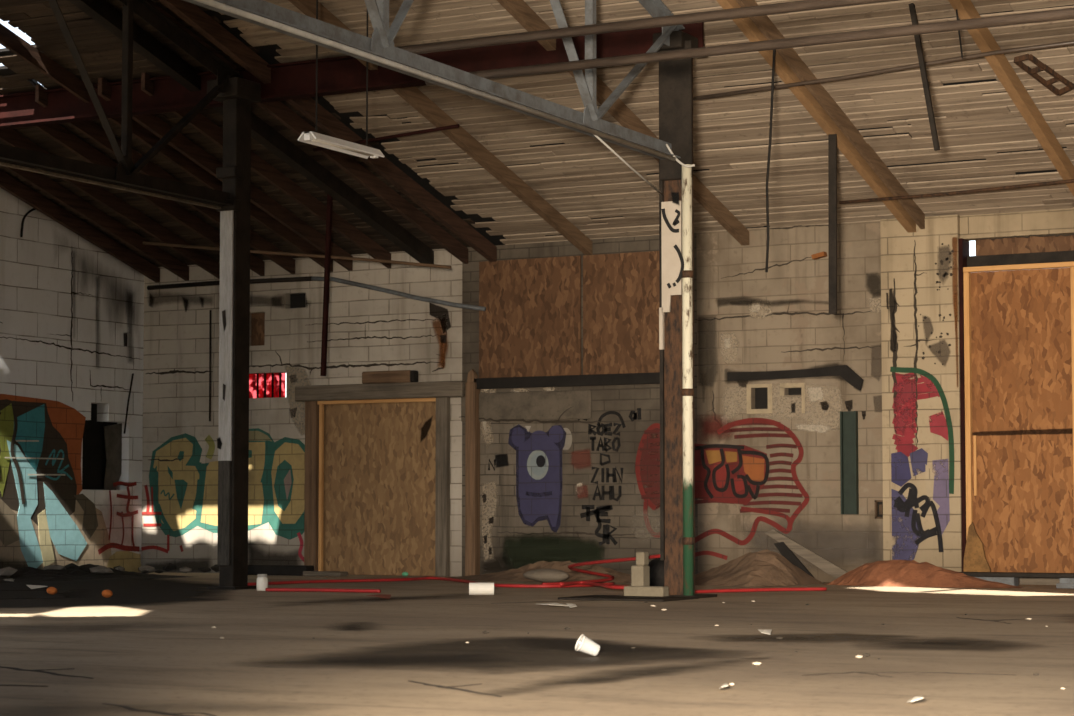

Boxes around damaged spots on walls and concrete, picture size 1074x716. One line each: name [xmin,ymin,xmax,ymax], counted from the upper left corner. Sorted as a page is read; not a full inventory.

peeling [935,243,954,291]
crack [0,253,213,401]
damp [82,262,132,364]
spalling [429,303,451,343]
crack [695,240,937,447]
peeling [918,314,951,365]
crack [0,666,94,687]
crack [102,703,215,716]